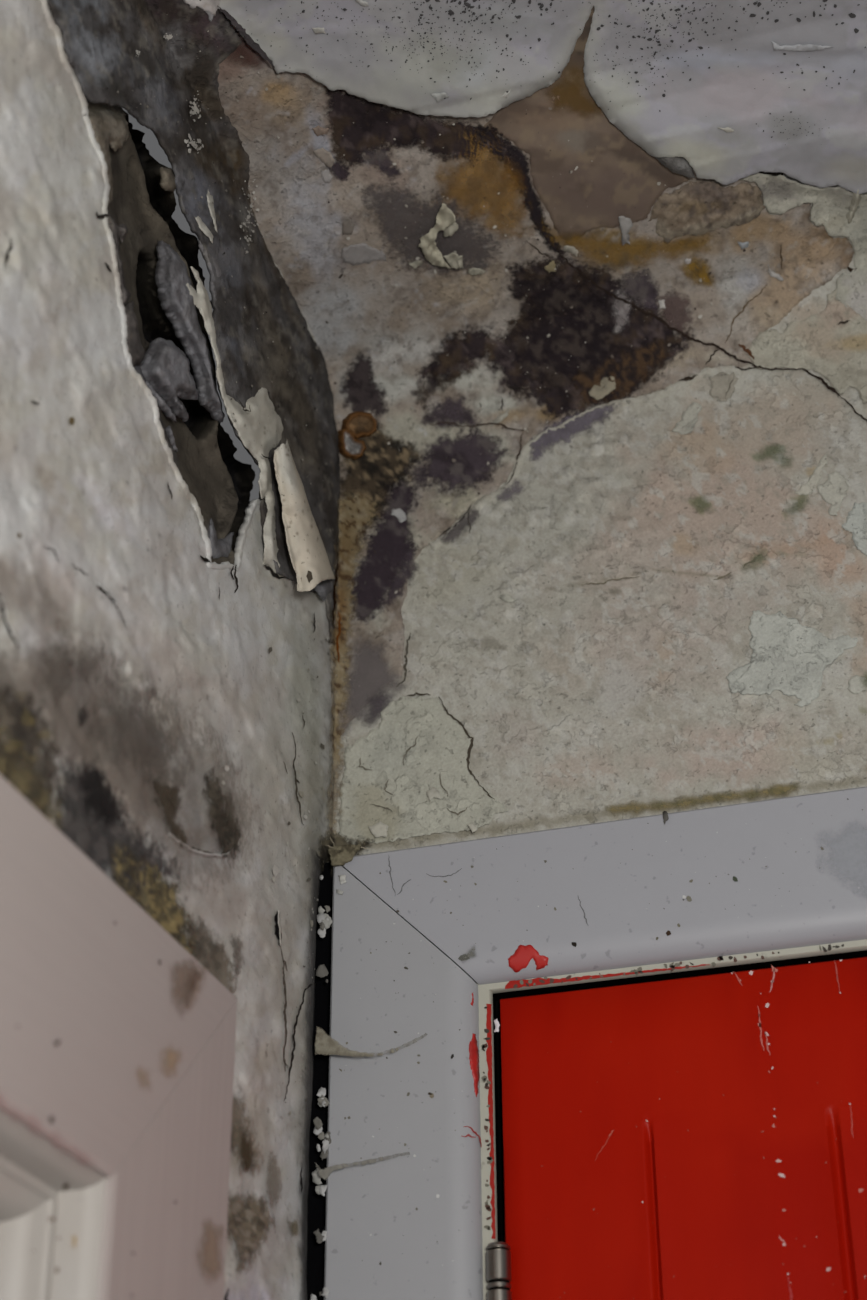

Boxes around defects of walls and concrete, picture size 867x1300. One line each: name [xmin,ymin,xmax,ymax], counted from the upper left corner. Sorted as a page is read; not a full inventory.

leakage [229,0,567,100]
leakage [580,0,866,112]
flaking render [41,0,867,743]
leakage [325,87,694,622]
crack [527,241,867,421]
leakage [153,781,187,846]
leakage [203,768,240,859]
rust [327,494,377,834]
crack [396,633,494,815]
leakage [174,911,242,1005]
leakage [203,857,322,1300]
crack [275,911,312,1101]